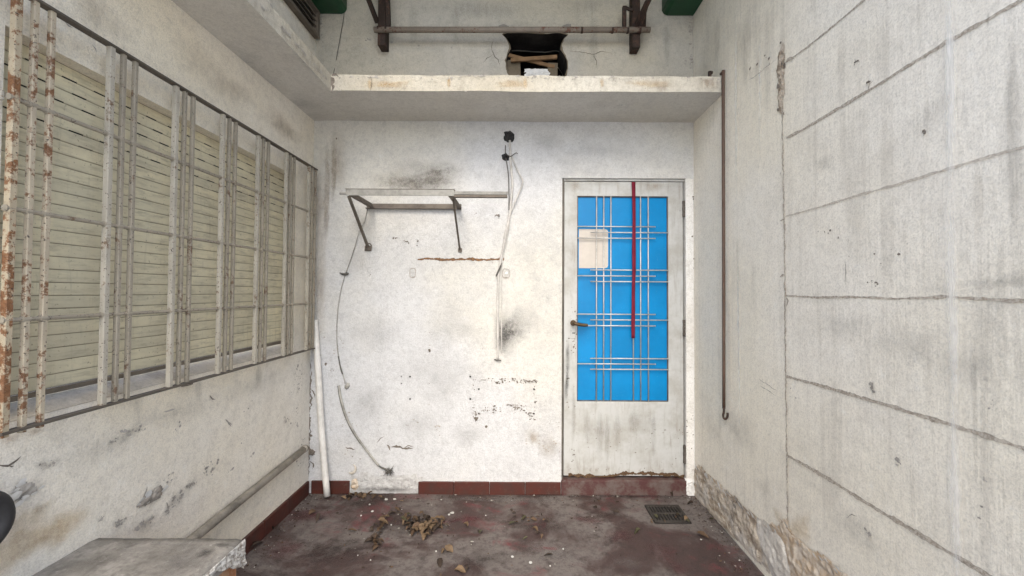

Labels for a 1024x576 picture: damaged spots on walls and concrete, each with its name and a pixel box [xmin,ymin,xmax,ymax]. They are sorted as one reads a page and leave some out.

spalling [499,16,720,92]
spalling [749,42,785,115]
peeling [472,378,537,428]
spalling [98,459,219,531]
corrosion [568,471,685,479]
spalling [694,464,847,576]